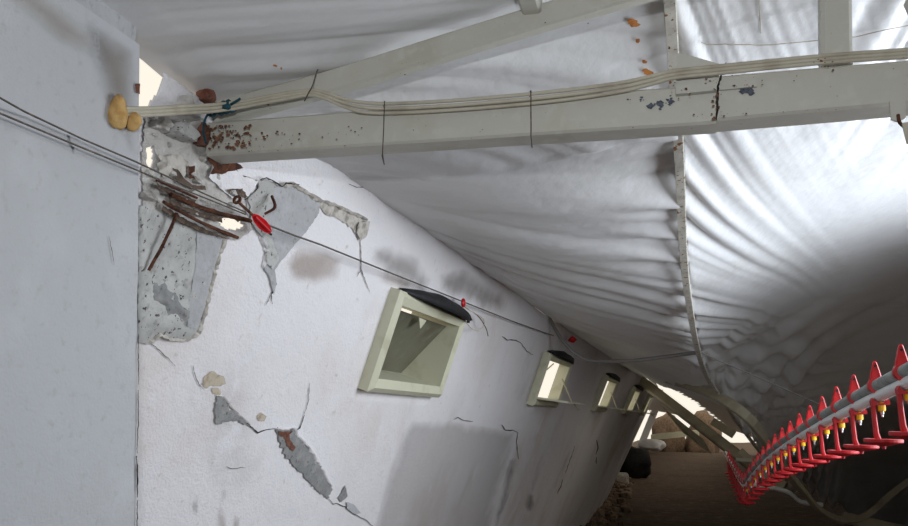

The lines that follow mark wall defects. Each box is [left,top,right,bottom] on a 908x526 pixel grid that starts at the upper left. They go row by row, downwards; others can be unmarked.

corrosion [206,124,301,152]
flaking render [137,115,370,345]
crack [136,334,170,526]
flaking render [202,371,266,426]
flaking render [273,426,360,514]